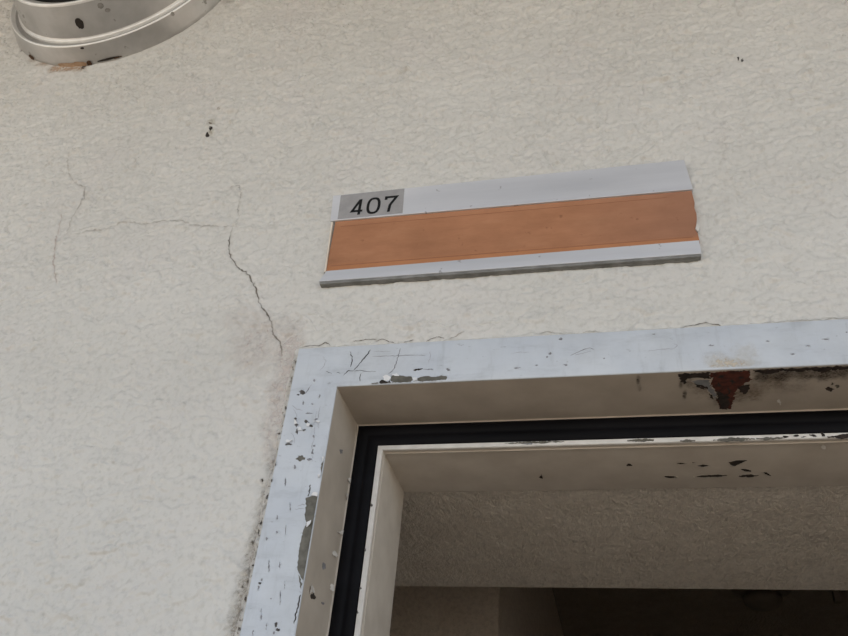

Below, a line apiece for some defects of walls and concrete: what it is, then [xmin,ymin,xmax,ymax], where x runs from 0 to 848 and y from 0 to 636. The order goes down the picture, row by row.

crack [52,153,282,352]
crack [309,331,464,379]
peeling [370,368,451,384]
corrosion [678,360,756,410]
peeling [284,379,325,477]
peeling [676,459,772,478]
peeling [288,485,324,622]
peeling [250,607,282,636]